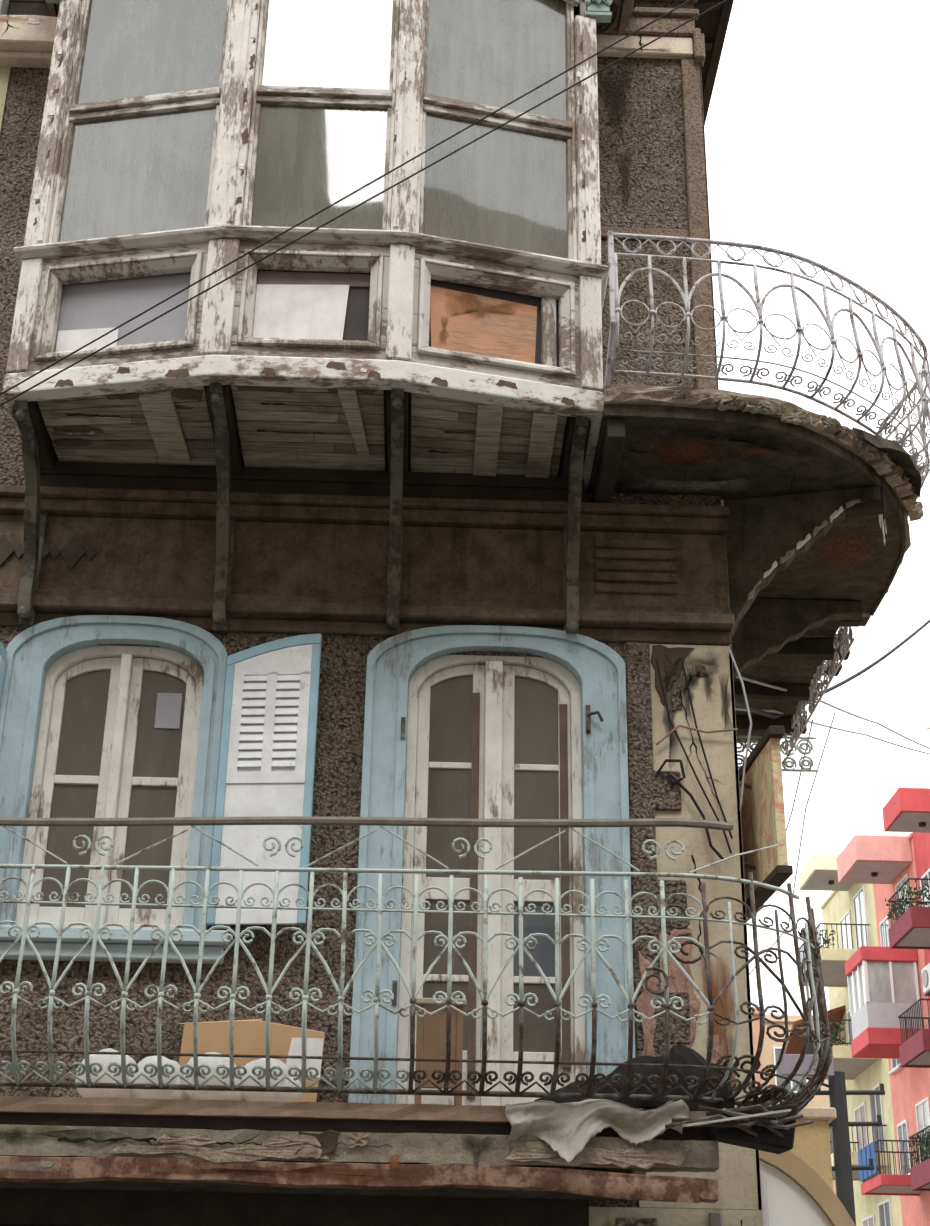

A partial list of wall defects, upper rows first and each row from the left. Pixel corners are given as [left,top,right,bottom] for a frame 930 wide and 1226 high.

peeling [243,32,256,104]
peeling [48,379,74,387]
peeling [158,368,203,410]
peeling [235,365,295,394]
peeling [318,359,381,395]
peeling [424,373,448,387]
peeling [488,376,519,390]
spalling [672,389,924,521]
spalling [101,1130,370,1164]
spalling [505,1141,689,1169]